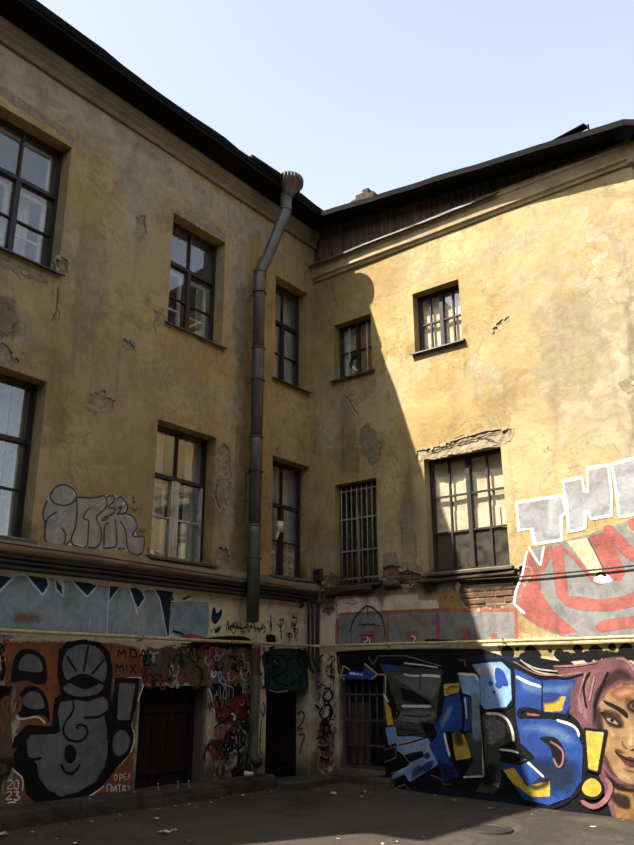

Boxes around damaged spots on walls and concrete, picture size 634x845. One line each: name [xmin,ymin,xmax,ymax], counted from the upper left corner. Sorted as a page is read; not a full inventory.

flaking render [490,315,511,336]
flaking render [0,340,21,368]
flaking render [414,426,514,461]
flaking render [380,550,427,588]
flaking render [455,563,533,612]
flaking render [316,717,336,775]